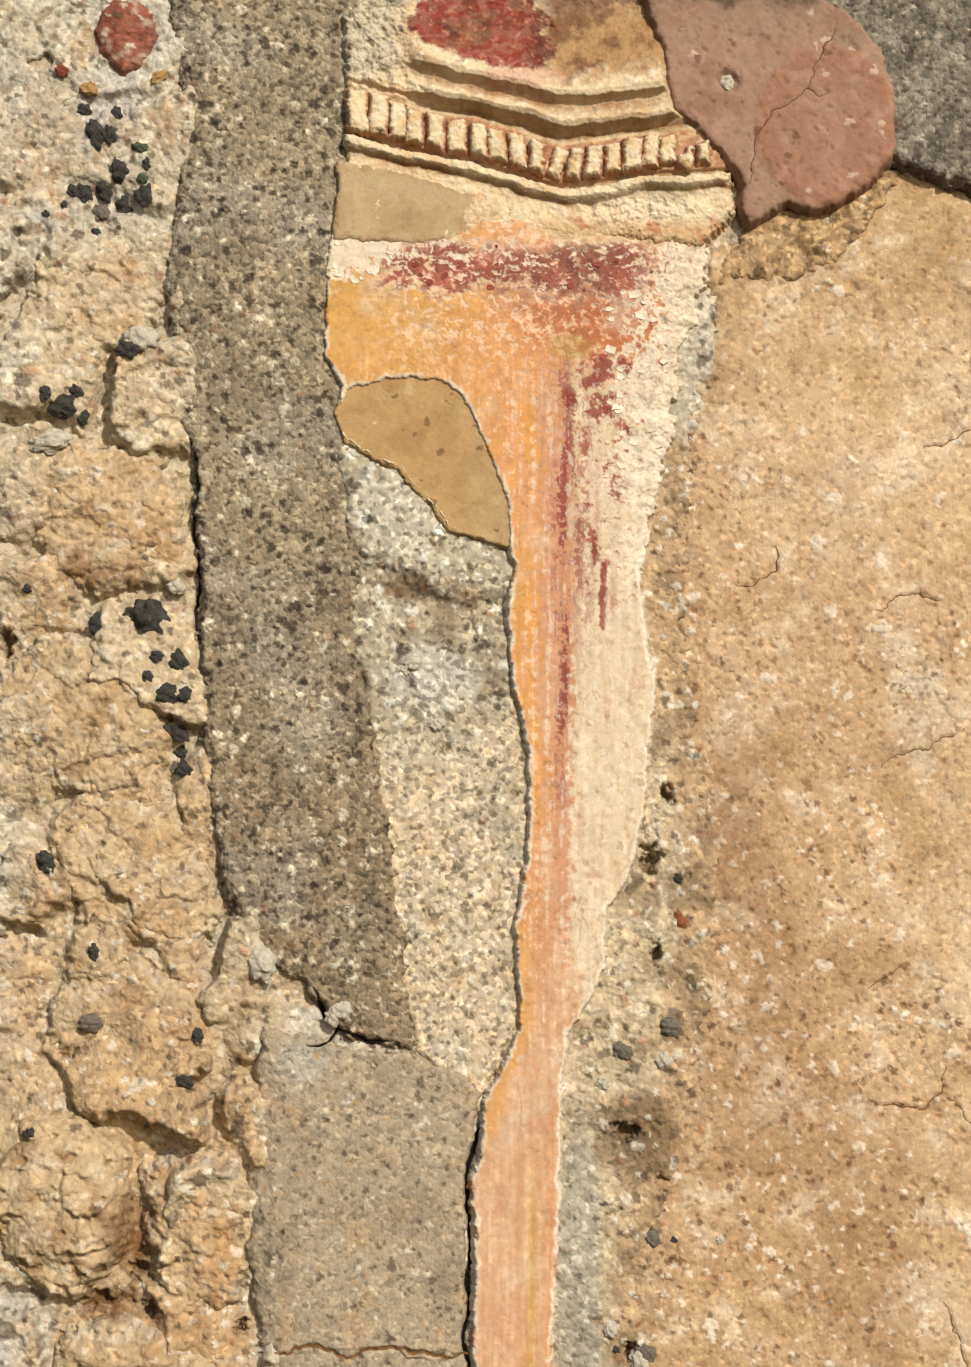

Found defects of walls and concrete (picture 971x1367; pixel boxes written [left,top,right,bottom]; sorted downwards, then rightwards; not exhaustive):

crack [750,24,837,182]
spalling [331,160,512,285]
peeling [604,289,659,323]
peeling [604,337,672,477]
crack [735,546,779,587]
crack [878,593,941,612]
spalling [333,377,529,1114]
crack [881,733,957,768]
crack [869,1066,971,1123]
crack [252,1093,484,1367]
crack [943,1302,968,1367]